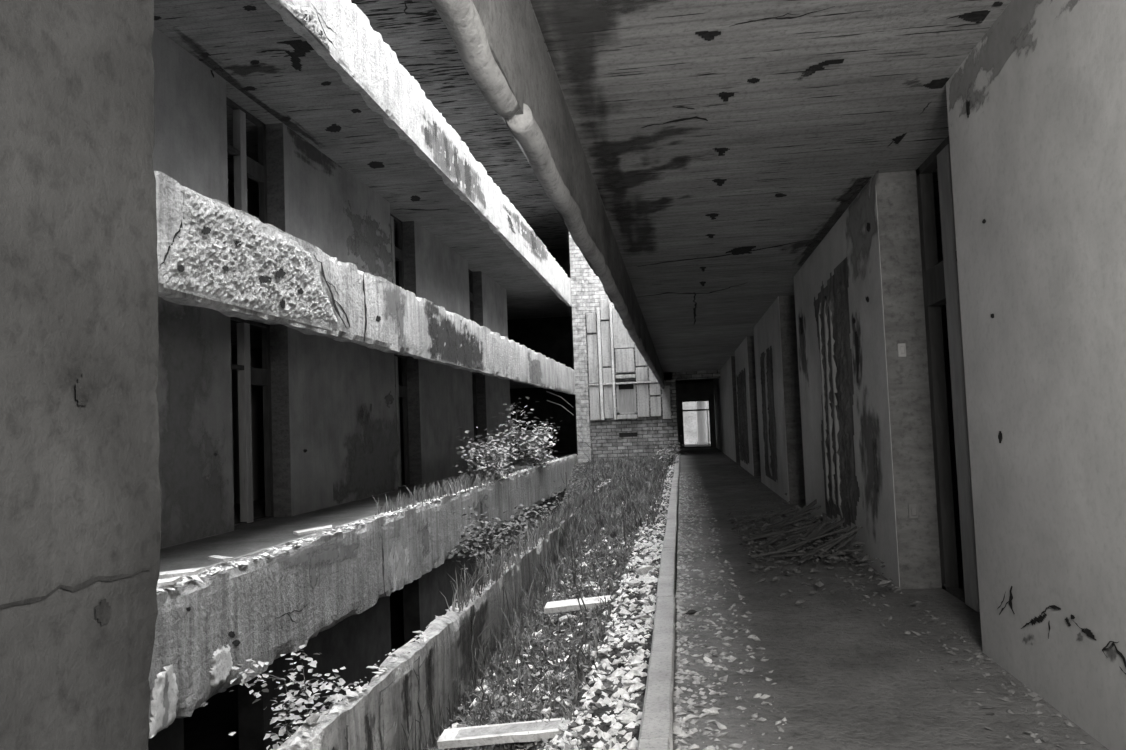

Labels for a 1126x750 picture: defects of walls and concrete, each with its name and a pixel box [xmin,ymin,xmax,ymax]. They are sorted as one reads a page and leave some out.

leakage [422,116,486,209]
leakage [530,0,691,252]
spalling [159,186,339,331]
leakage [503,204,548,262]
leakage [424,302,485,371]
leakage [852,315,882,537]
spalling [1021,605,1096,642]
peeling [209,631,240,693]
peeling [149,663,179,738]